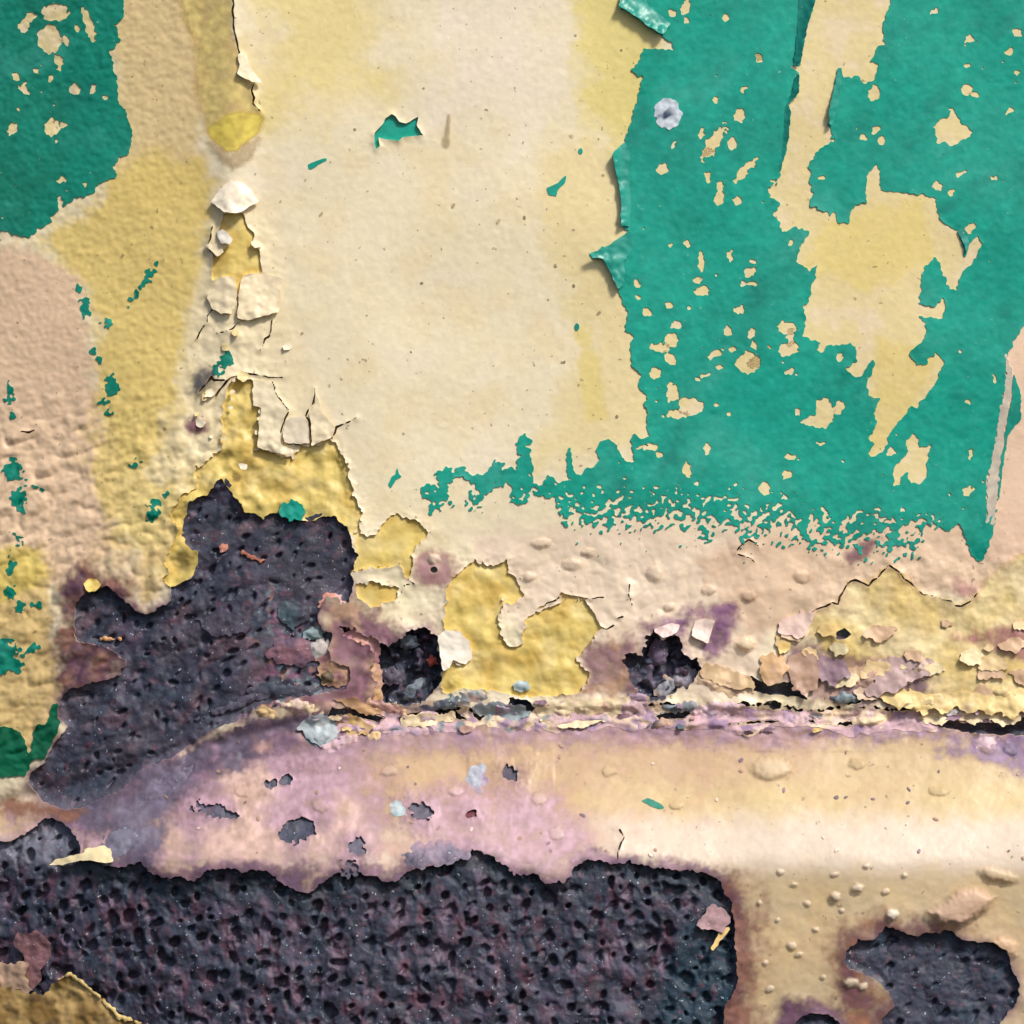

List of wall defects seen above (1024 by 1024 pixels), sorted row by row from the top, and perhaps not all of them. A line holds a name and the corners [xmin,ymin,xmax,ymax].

spalling [12,3,97,95]
peeling [695,0,982,486]
crack [195,309,237,341]
crack [199,319,357,446]
spalling [649,320,731,420]
peeling [438,559,603,705]
peeling [654,623,680,638]
crack [812,565,977,612]
peeling [809,554,1024,697]
peeling [50,845,113,865]
peeling [696,904,730,951]
peeling [0,930,142,1024]